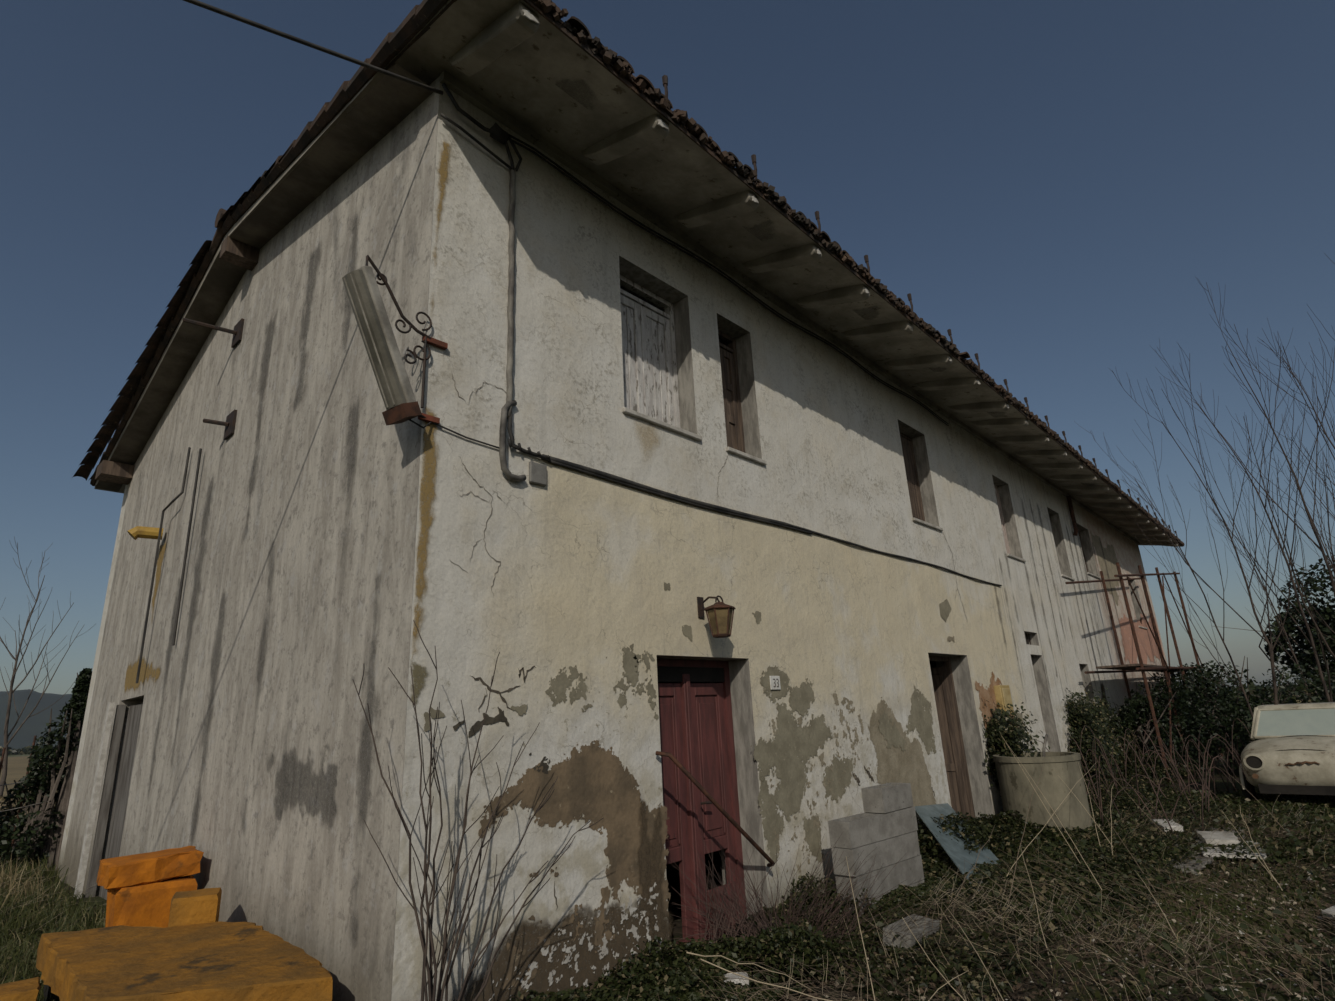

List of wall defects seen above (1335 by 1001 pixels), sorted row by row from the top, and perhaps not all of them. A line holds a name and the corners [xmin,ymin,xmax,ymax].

crack [449,456,505,596]
crack [472,676,519,710]
peeling [545,665,594,712]
peeling [606,644,659,720]
spalling [975,671,1026,739]
peeling [751,665,936,873]
spalling [478,740,671,1001]